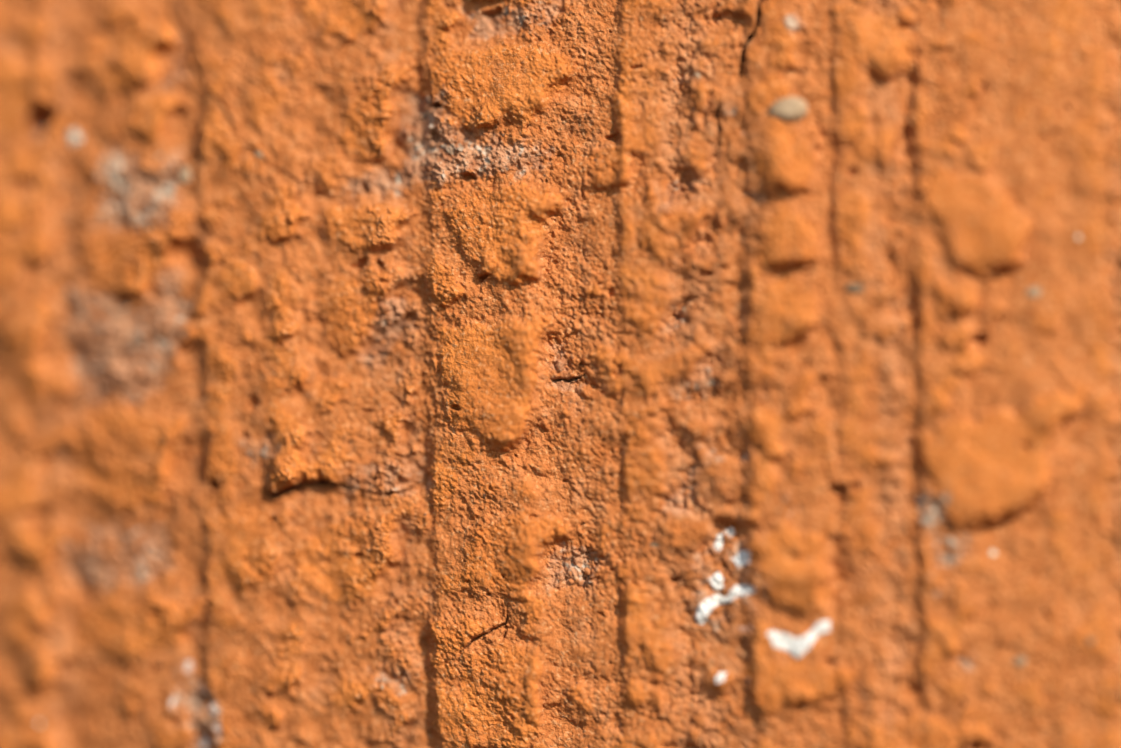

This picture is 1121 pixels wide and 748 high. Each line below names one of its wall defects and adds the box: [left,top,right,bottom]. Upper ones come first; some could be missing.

crack [167,0,313,213]
crack [714,0,765,154]
crack [258,478,421,501]